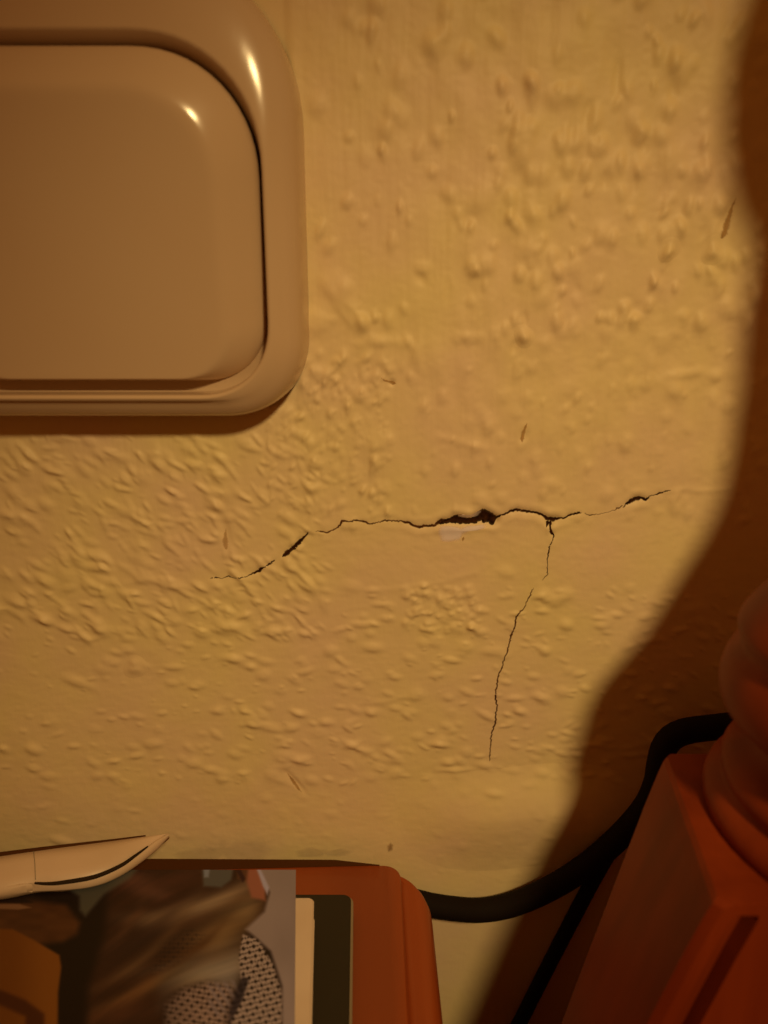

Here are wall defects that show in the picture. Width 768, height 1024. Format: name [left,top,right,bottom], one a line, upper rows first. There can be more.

crack [212,490,670,761]